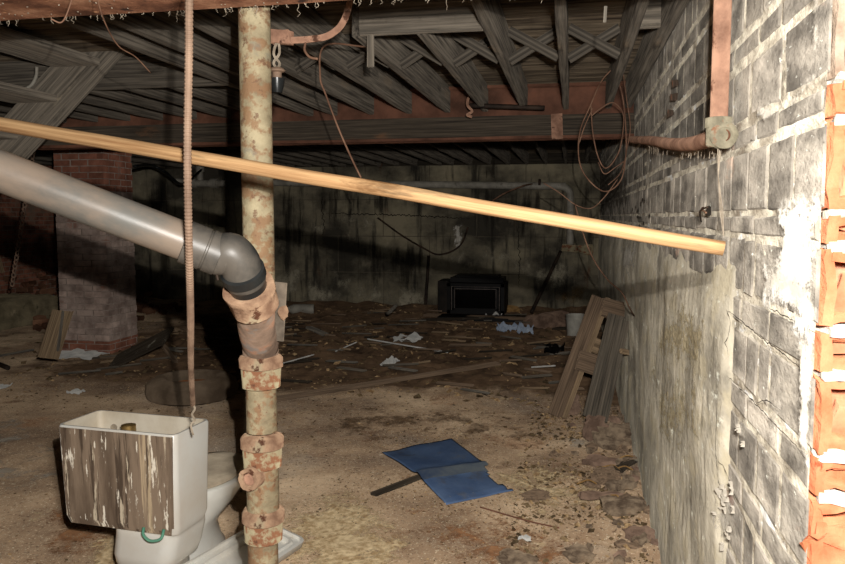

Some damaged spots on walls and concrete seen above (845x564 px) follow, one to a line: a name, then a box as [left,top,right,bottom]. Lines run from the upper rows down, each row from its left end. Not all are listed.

crack [724,311,800,368]
water stain [757,195,820,466]
crack [715,408,751,534]